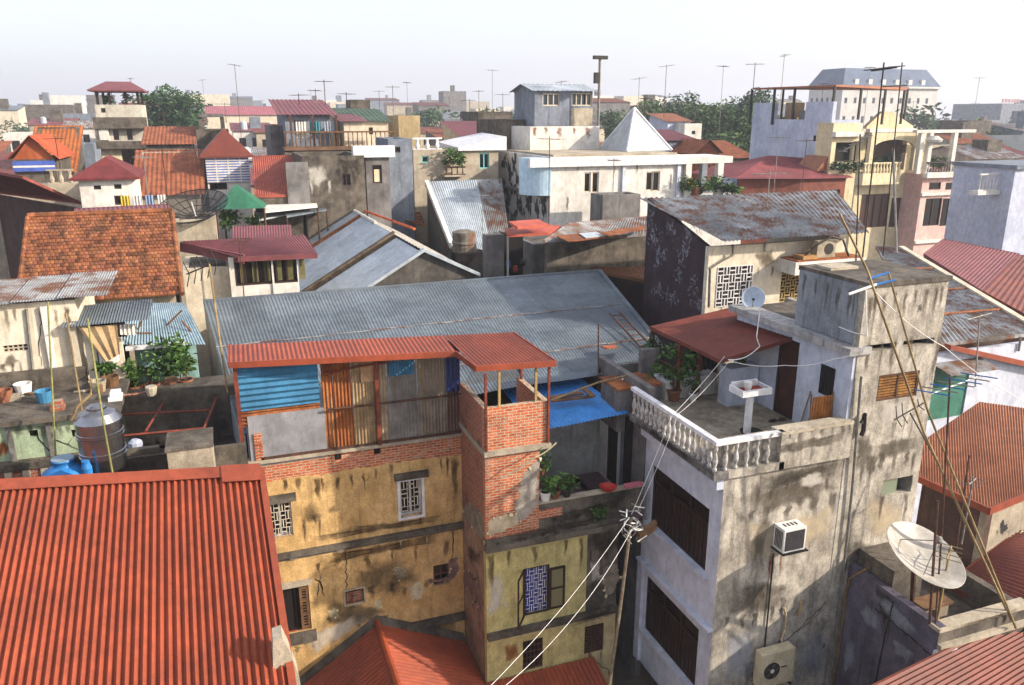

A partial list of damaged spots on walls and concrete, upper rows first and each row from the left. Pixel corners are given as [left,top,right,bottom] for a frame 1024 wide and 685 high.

leakage [884,402,908,425]
leakage [771,421,851,451]
leakage [440,459,458,485]
leakage [347,516,421,535]
leakage [742,465,837,557]
crack [315,550,348,596]
leakage [335,537,427,592]
leakage [740,586,784,621]